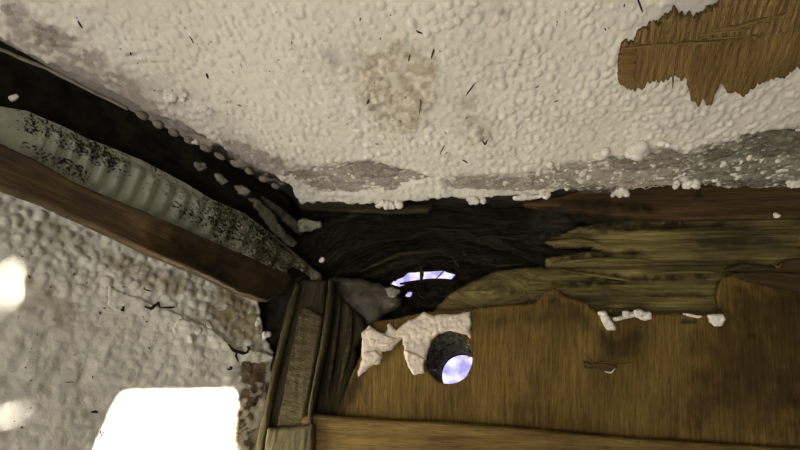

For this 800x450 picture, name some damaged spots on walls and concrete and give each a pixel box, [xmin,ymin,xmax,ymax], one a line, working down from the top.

water stain [1,4,160,114]
water stain [17,110,132,185]
water stain [170,122,289,176]
water stain [144,163,300,342]
spalling [286,126,800,320]
peeling [362,328,397,366]
peeling [405,350,425,375]